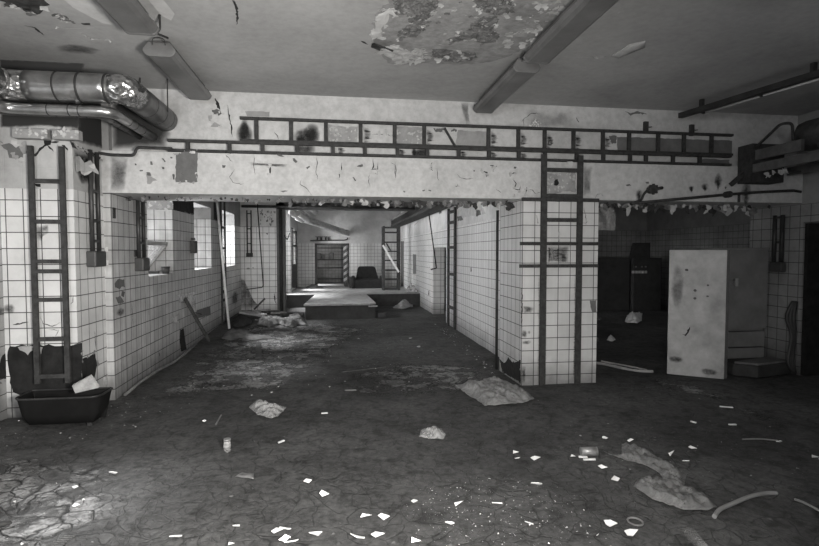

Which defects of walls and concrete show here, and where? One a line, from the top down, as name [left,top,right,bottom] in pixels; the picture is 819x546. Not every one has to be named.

peeling [369,0,567,66]
leakage [297,126,317,141]
flaking render [135,151,198,184]
crack [300,158,342,194]
crack [429,163,540,197]
peeling [128,190,515,235]
peeling [599,202,771,217]
peeling [0,343,100,395]
flaking render [499,357,521,384]